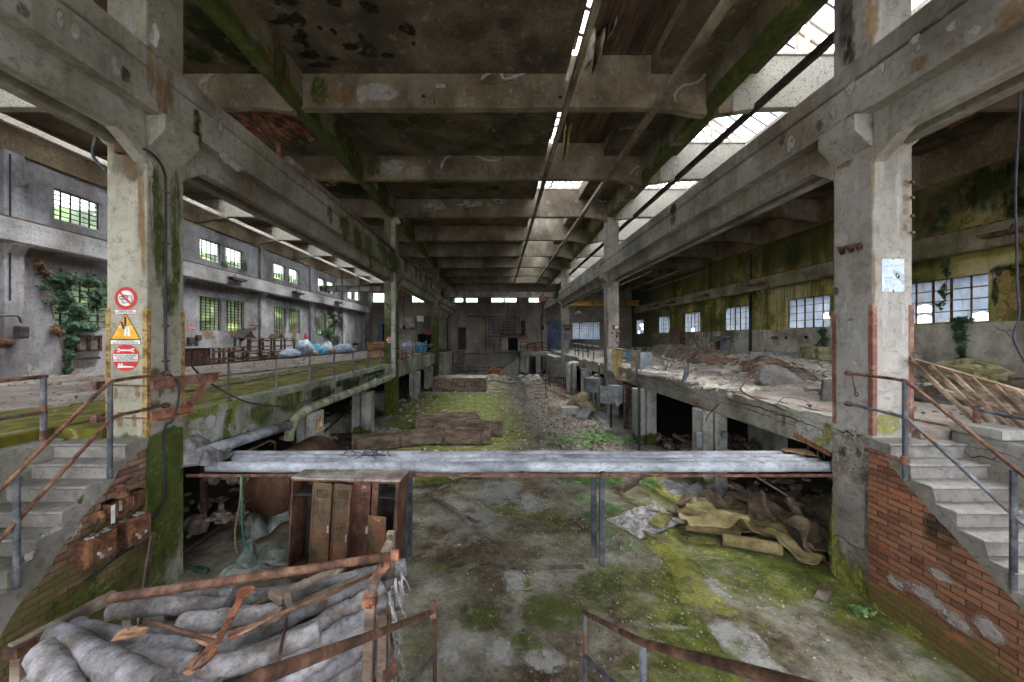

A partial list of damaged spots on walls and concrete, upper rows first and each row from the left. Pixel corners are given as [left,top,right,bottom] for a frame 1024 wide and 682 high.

leakage [26,249,94,267]
leakage [117,155,242,315]